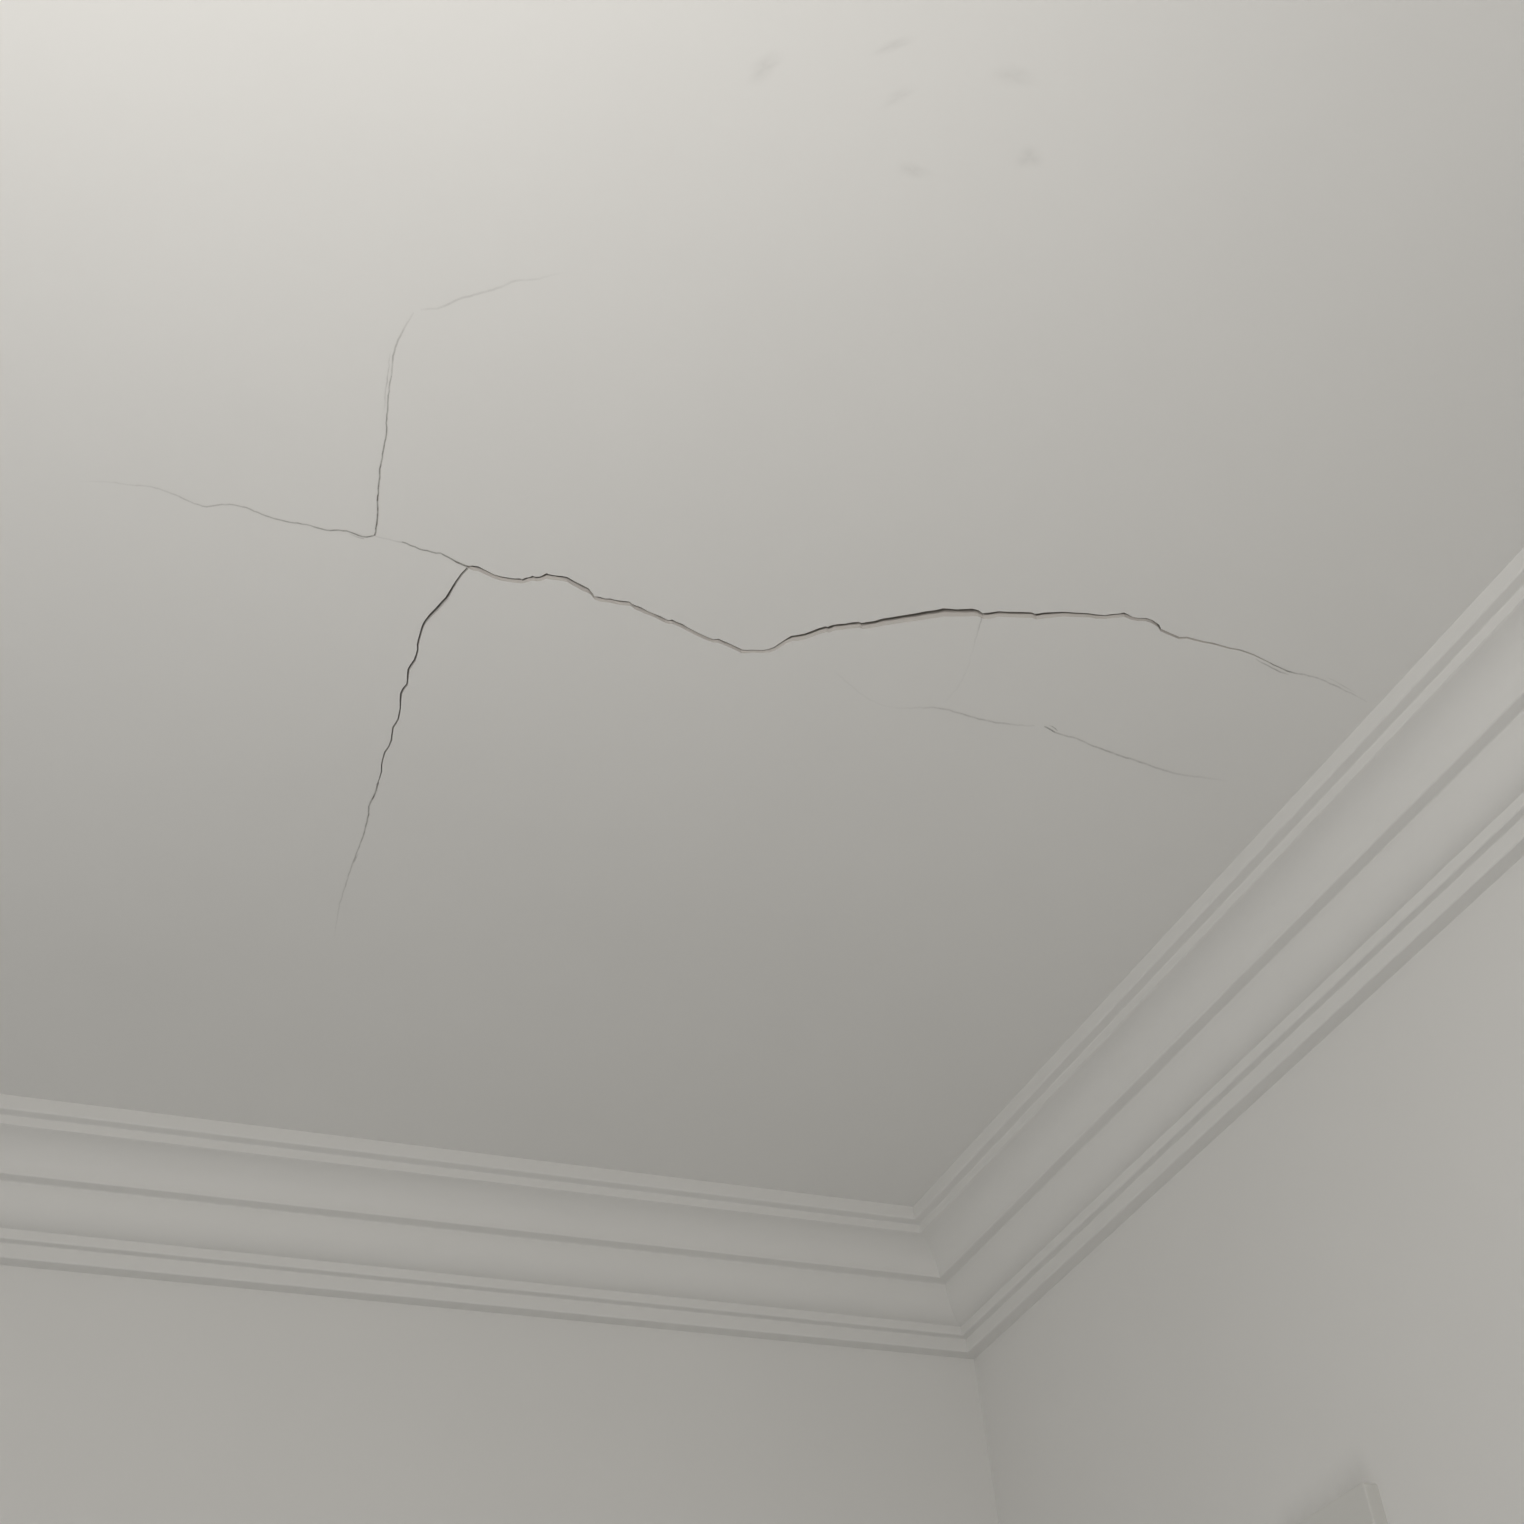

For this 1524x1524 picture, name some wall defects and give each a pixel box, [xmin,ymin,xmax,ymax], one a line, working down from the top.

crack [332,427,387,537]
crack [368,548,1290,816]